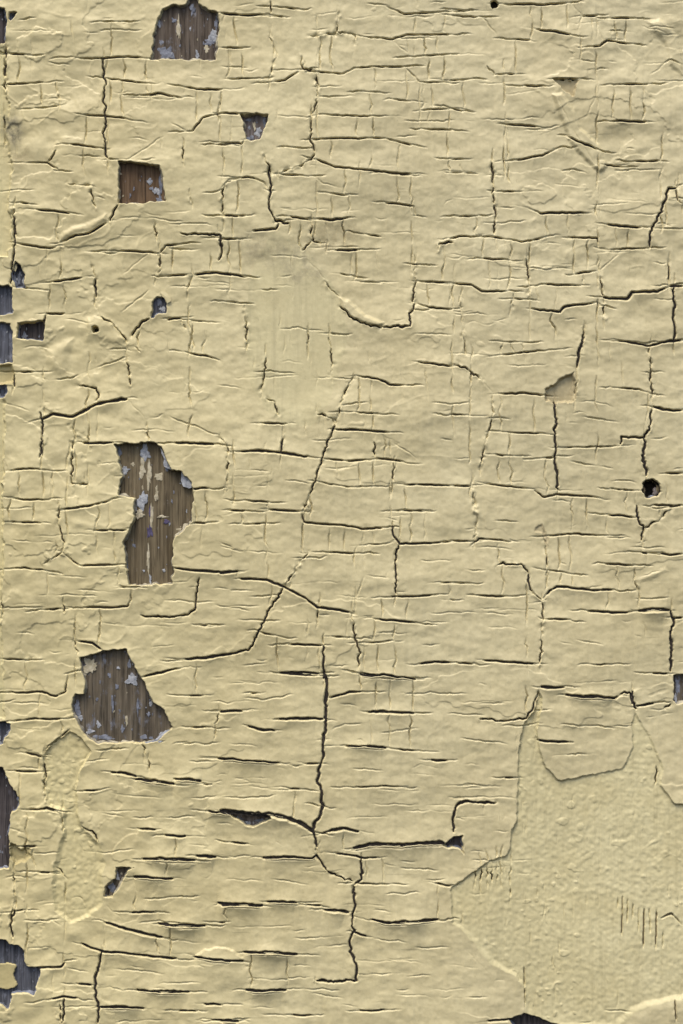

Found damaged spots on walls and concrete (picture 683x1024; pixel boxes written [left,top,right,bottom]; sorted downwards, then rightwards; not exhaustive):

peeling [150,0,219,61]
peeling [0,8,45,398]
crack [10,191,118,289]
peeling [118,161,166,204]
crack [37,57,410,287]
crack [16,277,202,470]
crack [13,442,117,570]
peeling [115,442,194,586]
crack [46,152,682,1024]
crack [11,684,98,839]
peeling [44,649,172,924]
peeling [0,939,41,1008]